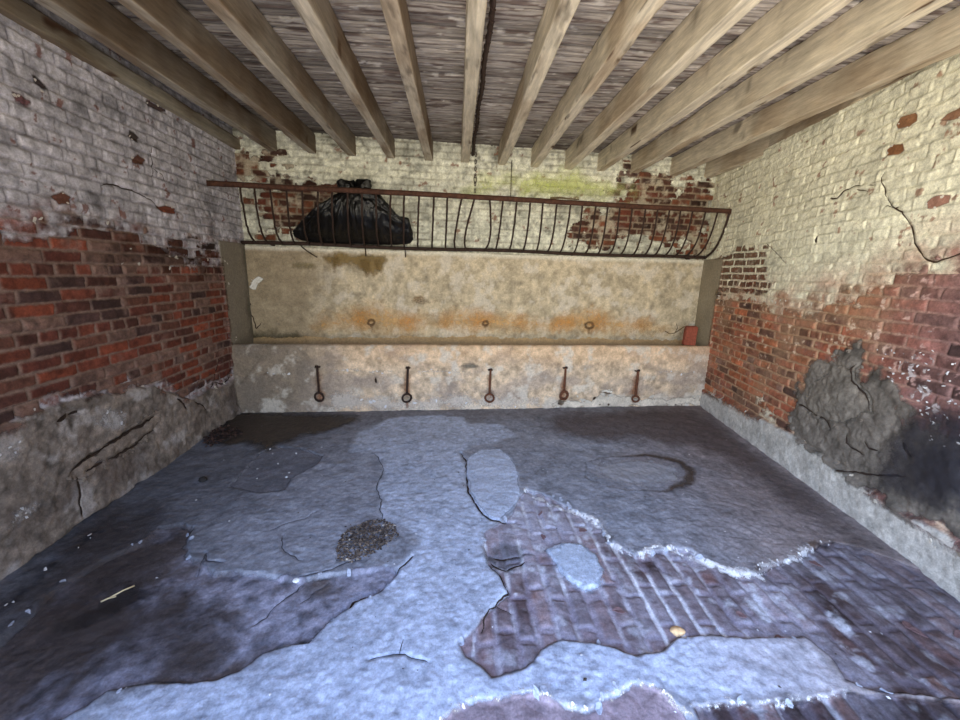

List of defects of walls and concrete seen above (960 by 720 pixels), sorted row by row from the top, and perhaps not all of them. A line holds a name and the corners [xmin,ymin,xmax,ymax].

peeling [51,192,71,205]
peeling [0,216,237,436]
leakage [323,253,386,274]
peeling [552,159,960,438]
crack [830,172,960,263]
crack [57,410,77,422]
crack [71,416,154,515]
crack [461,454,506,524]
leakage [555,412,827,518]
leakage [877,349,960,511]
leakage [1,512,216,688]
spalling [443,489,960,720]